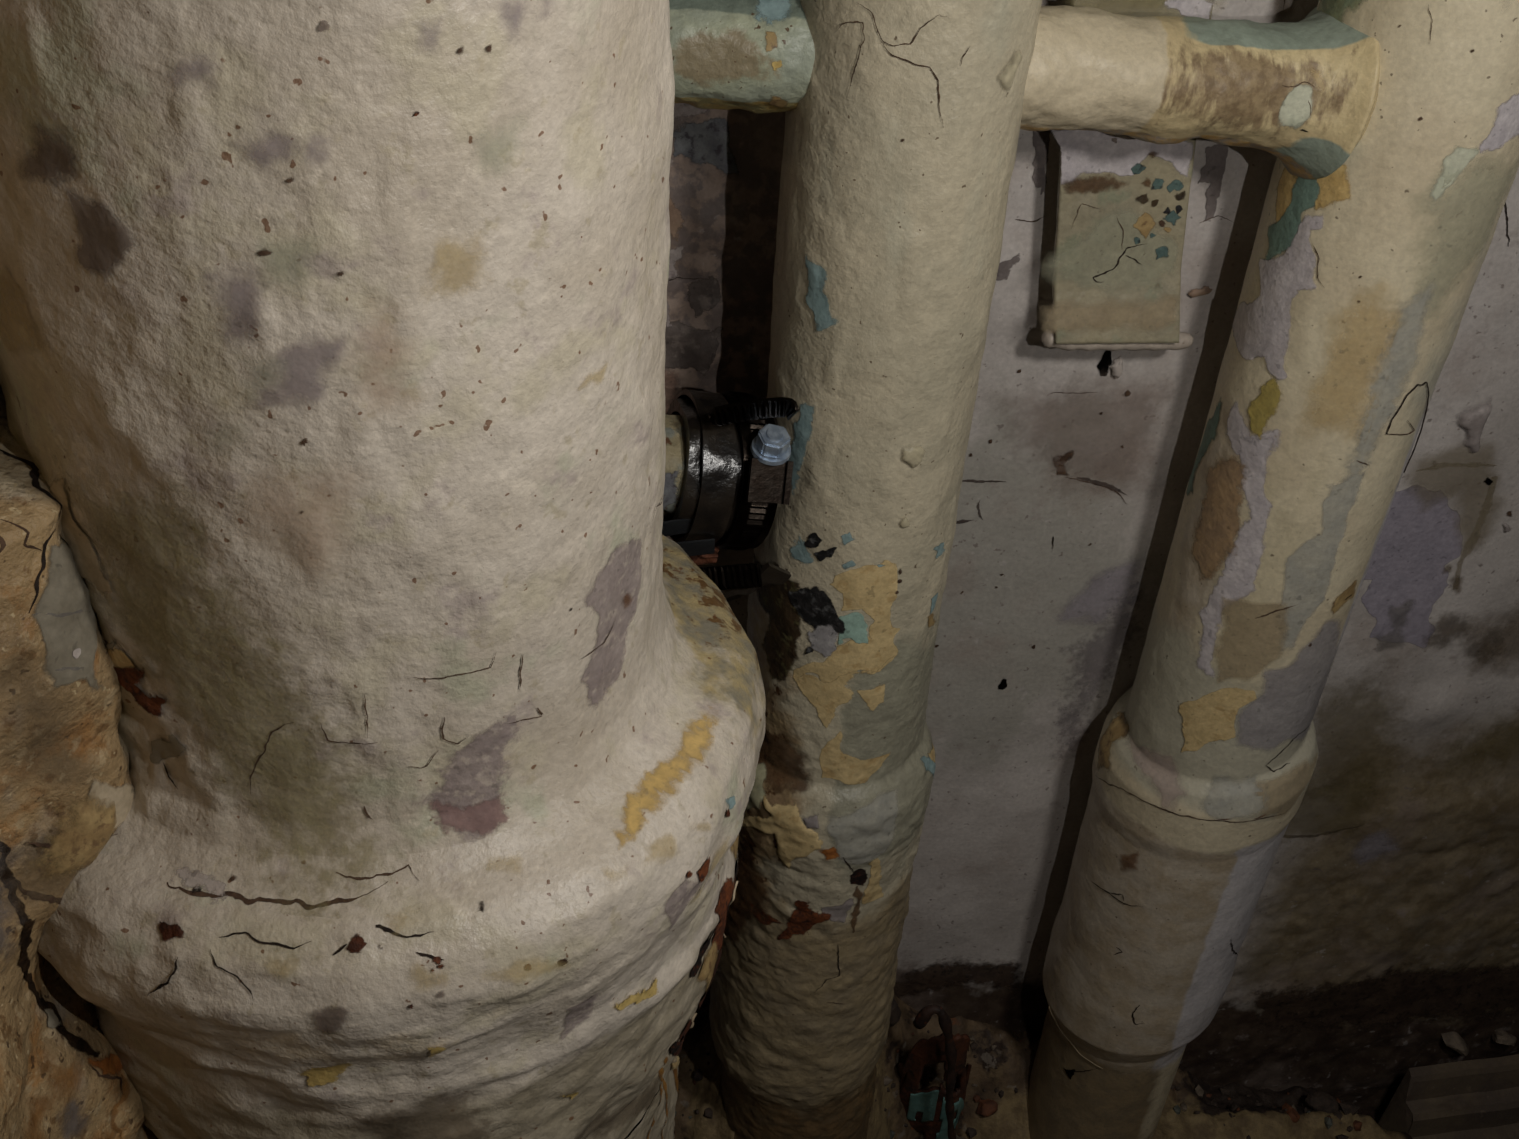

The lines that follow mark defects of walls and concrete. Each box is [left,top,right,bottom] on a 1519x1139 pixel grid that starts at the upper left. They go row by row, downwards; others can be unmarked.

spalling [673,103,739,174]
crack [838,4,969,128]
peeling [1279,74,1322,132]
spalling [665,195,723,414]
peeling [793,560,902,785]
crack [27,841,51,849]
peeling [731,763,898,923]
crack [15,878,62,904]
crack [147,864,444,1004]
crack [814,947,842,1004]
leakage [1254,964,1519,1032]
rust [647,1056,680,1139]